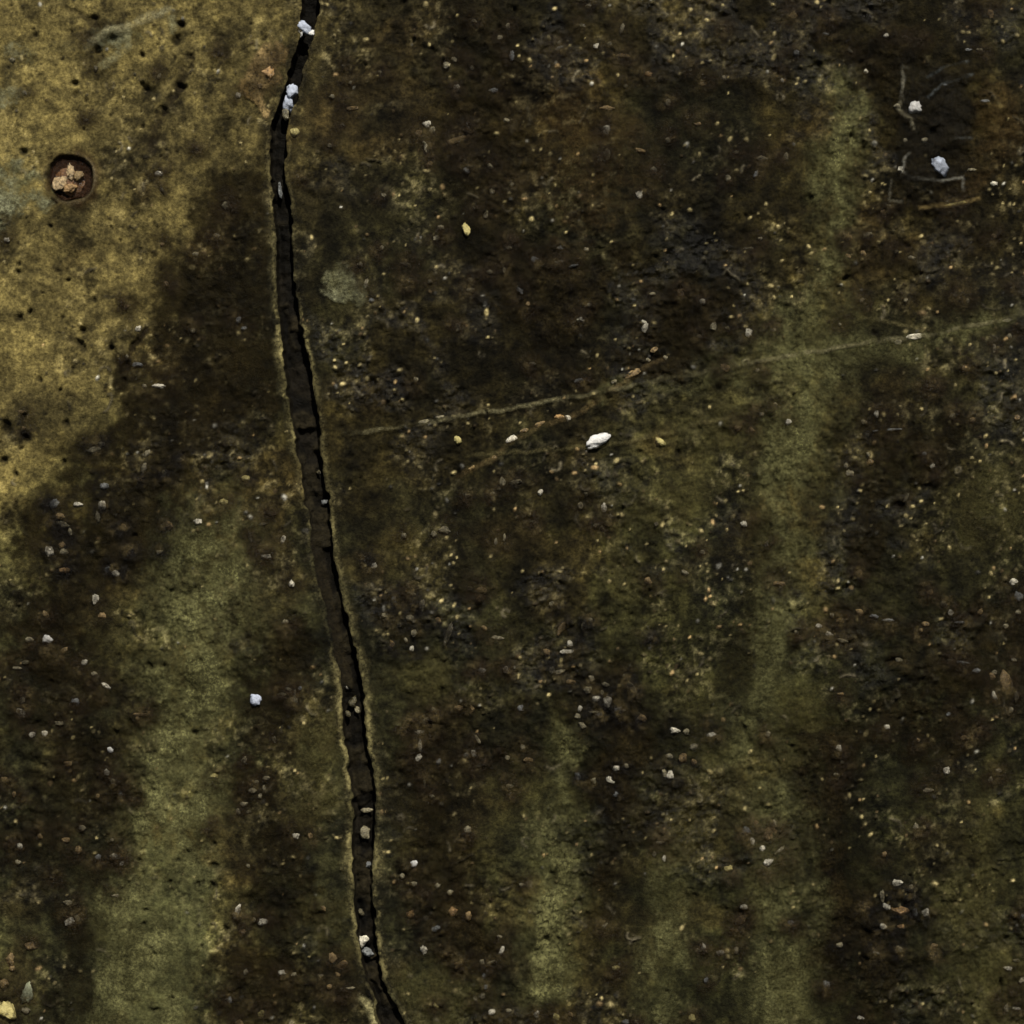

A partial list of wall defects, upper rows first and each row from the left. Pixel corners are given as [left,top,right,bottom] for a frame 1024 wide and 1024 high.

damp [0,158,321,1024]
crack [262,0,417,1024]
crack [418,347,668,471]
crack [760,342,865,362]
damp [737,325,965,692]
crack [891,318,1013,345]
damp [754,592,1024,1024]